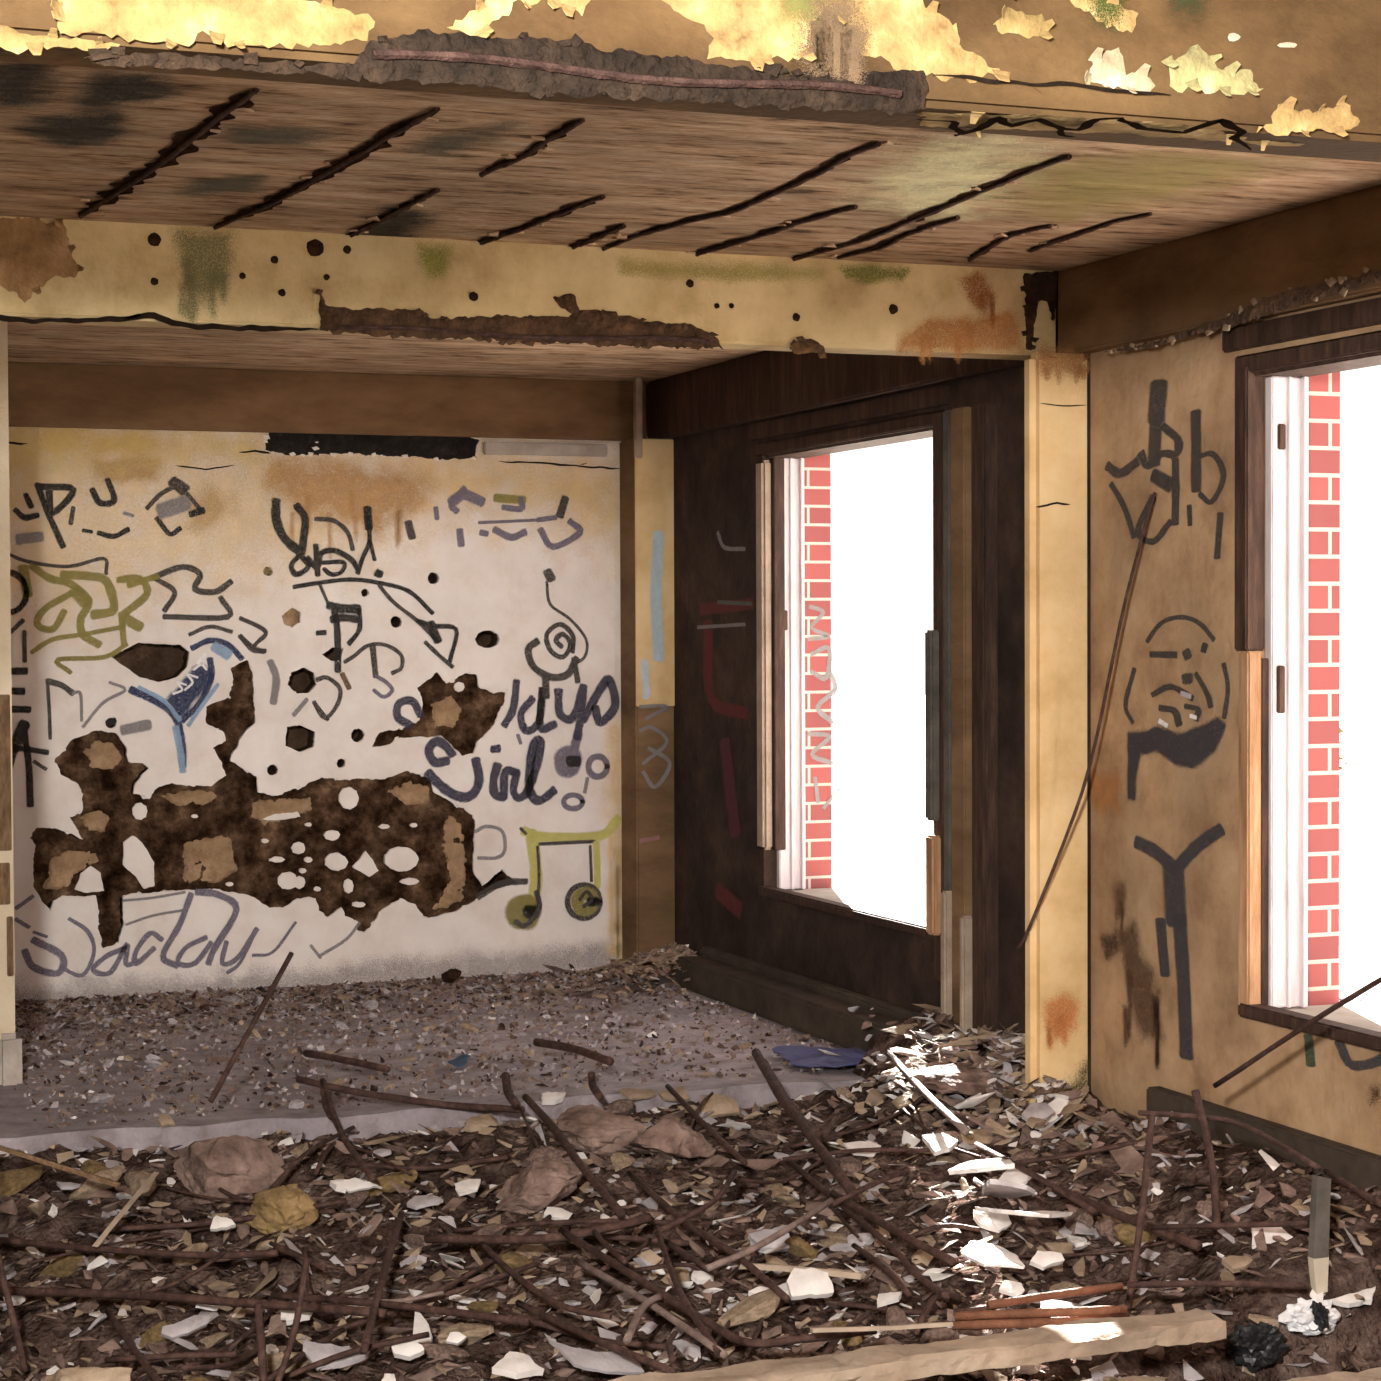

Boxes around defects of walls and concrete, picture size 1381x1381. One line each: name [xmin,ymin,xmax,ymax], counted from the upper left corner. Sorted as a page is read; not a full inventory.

spalling [0,0,1360,303]
corrosion [895,269,1091,386]
spalling [141,643,188,682]
flaking render [30,660,511,948]